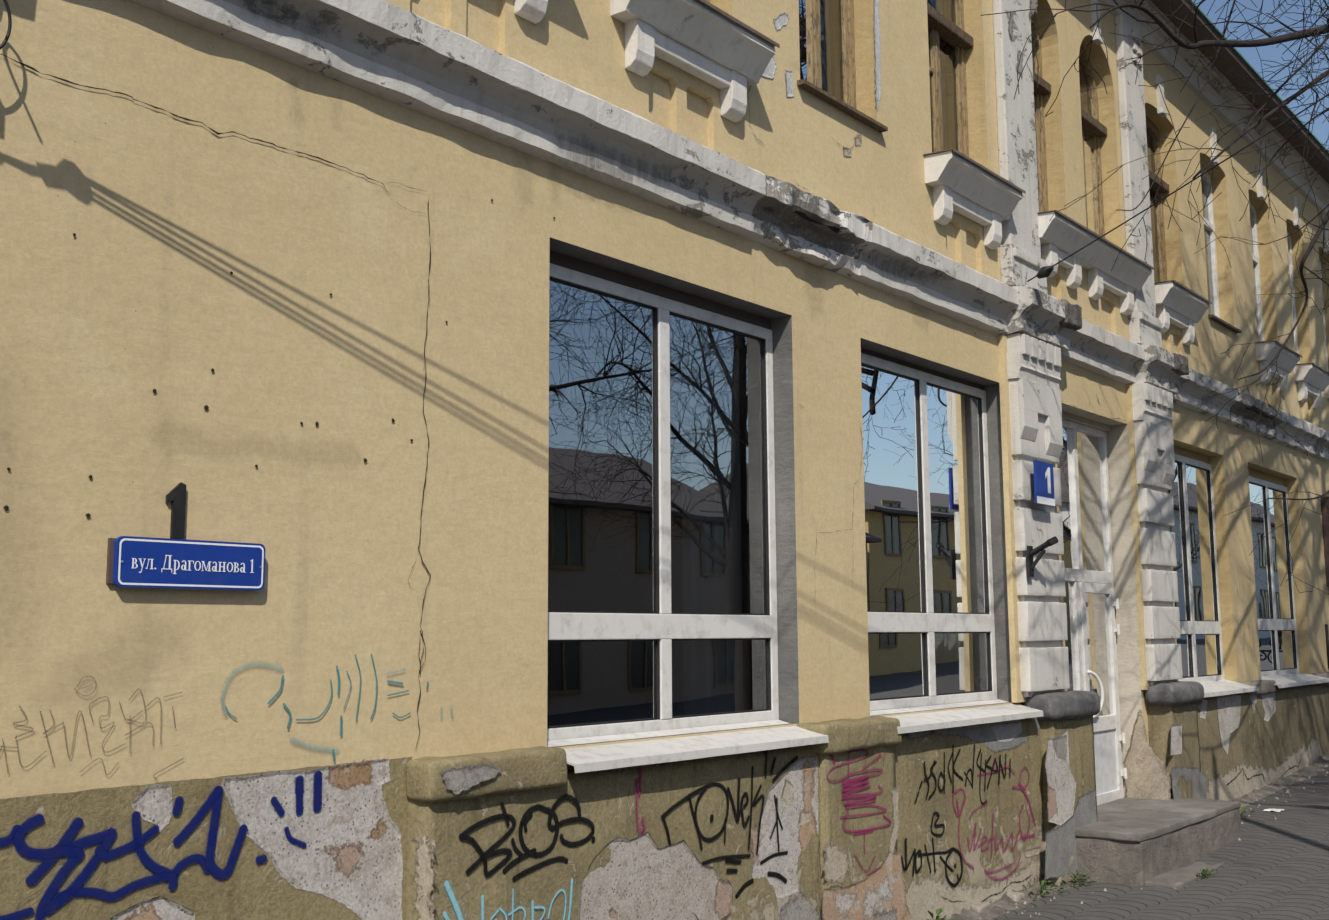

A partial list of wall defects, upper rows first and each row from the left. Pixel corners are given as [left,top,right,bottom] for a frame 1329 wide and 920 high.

peeling [1008,0,1038,78]
crack [1,54,431,750]
peeling [131,784,173,832]
peeling [109,895,196,920]
peeling [221,758,437,920]
peeling [441,763,501,794]
peeling [578,833,735,920]
peeling [750,755,1045,920]
peeling [1045,729,1076,825]
flaking render [1199,693,1323,801]